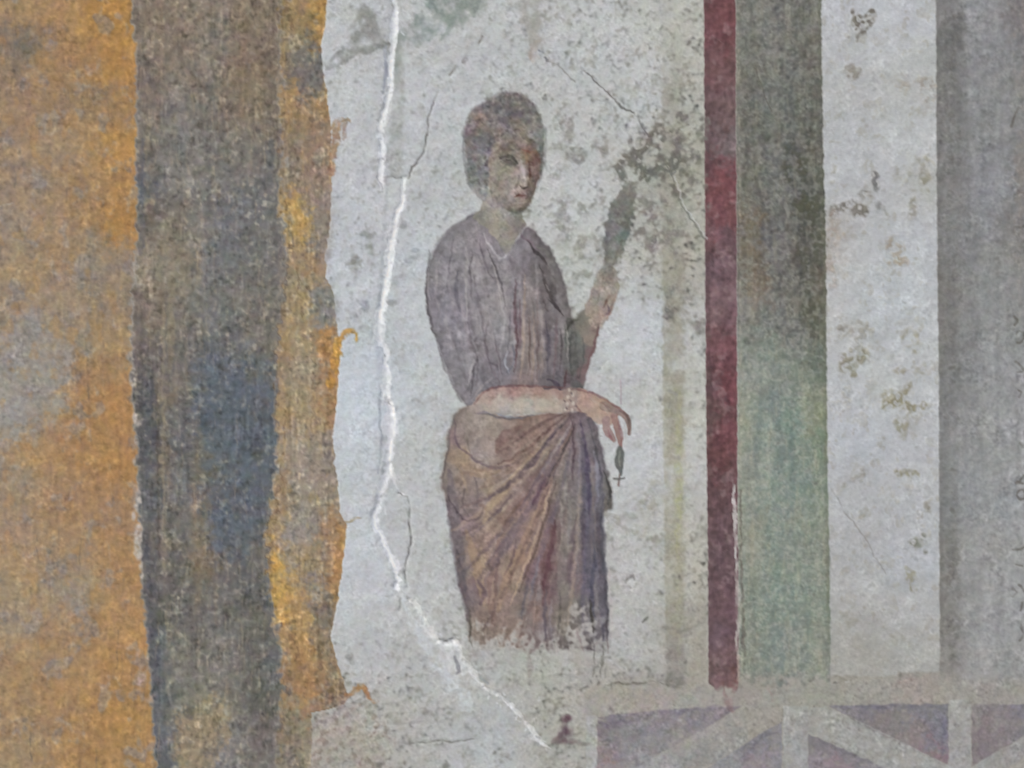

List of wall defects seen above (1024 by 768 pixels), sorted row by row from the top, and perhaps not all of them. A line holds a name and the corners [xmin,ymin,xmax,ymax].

crack [370,0,551,749]
crack [546,60,706,240]